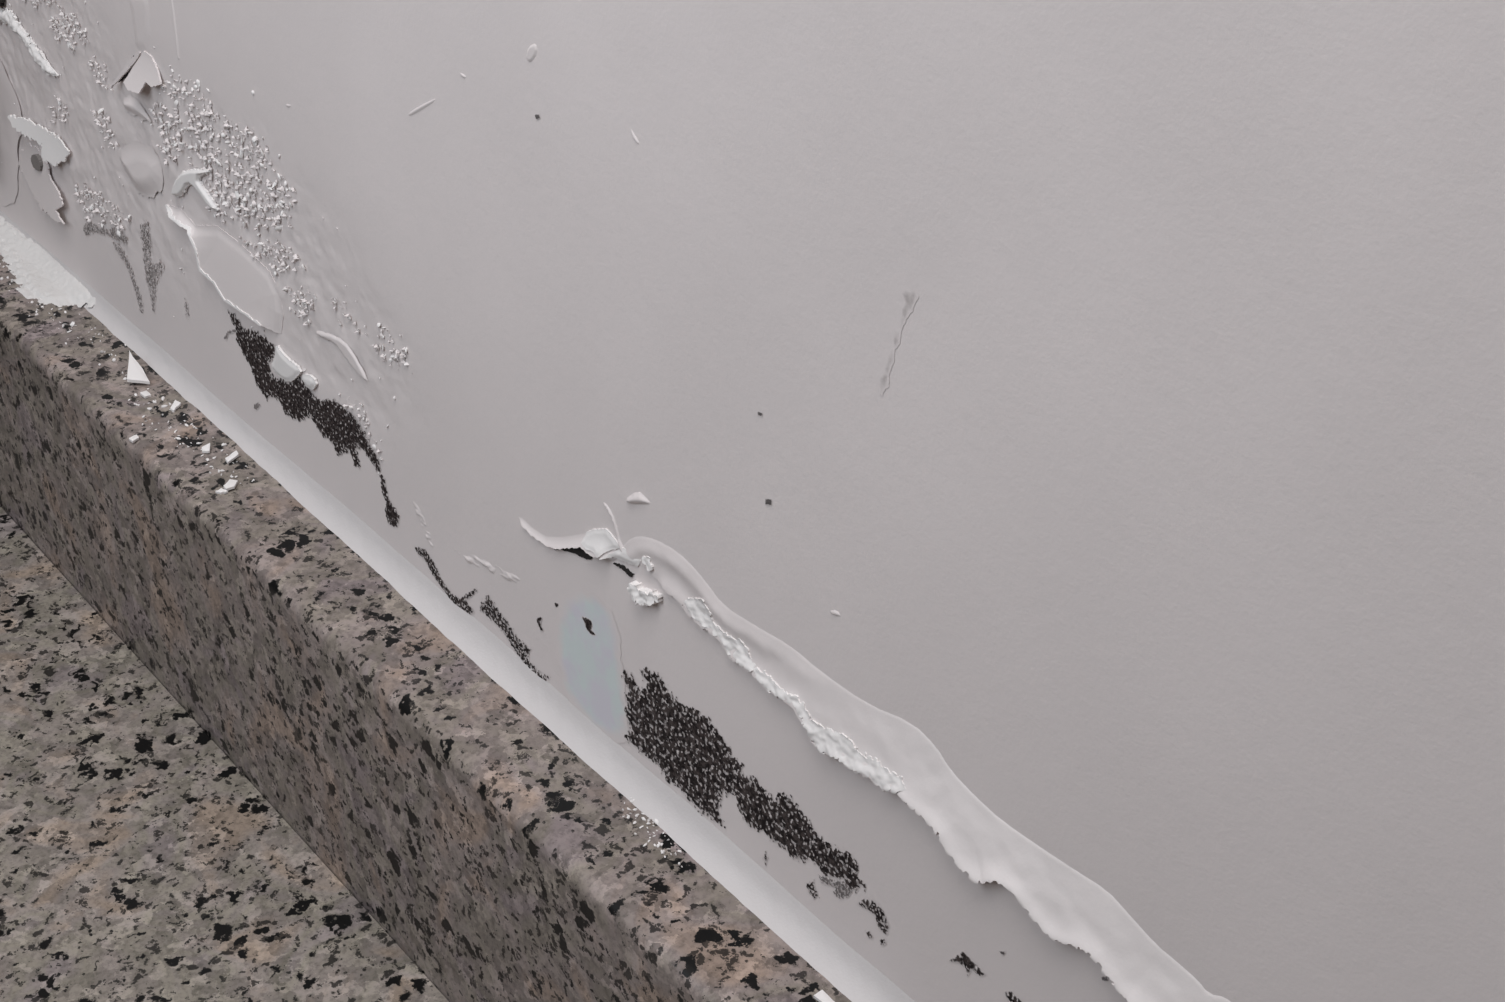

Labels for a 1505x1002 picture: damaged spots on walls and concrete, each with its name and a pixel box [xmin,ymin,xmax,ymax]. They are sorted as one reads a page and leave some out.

peeling [8,114,70,225]
peeling [109,51,162,94]
peeling [165,204,284,334]
leakage [223,309,400,528]
leakage [414,546,890,946]
peeling [519,502,1231,1002]